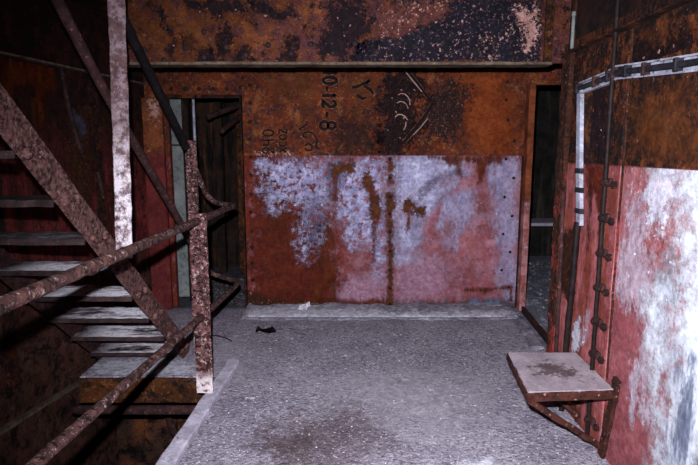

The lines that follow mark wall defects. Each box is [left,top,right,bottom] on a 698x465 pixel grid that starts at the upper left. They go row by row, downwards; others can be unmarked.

corrosion [180,20,256,62]
corrosion [280,33,300,62]
corrosion [428,68,515,184]
corrosion [248,158,428,305]
peeling [255,152,462,287]
corrosion [561,226,574,300]
corrosion [586,164,604,241]
peeling [615,168,698,465]